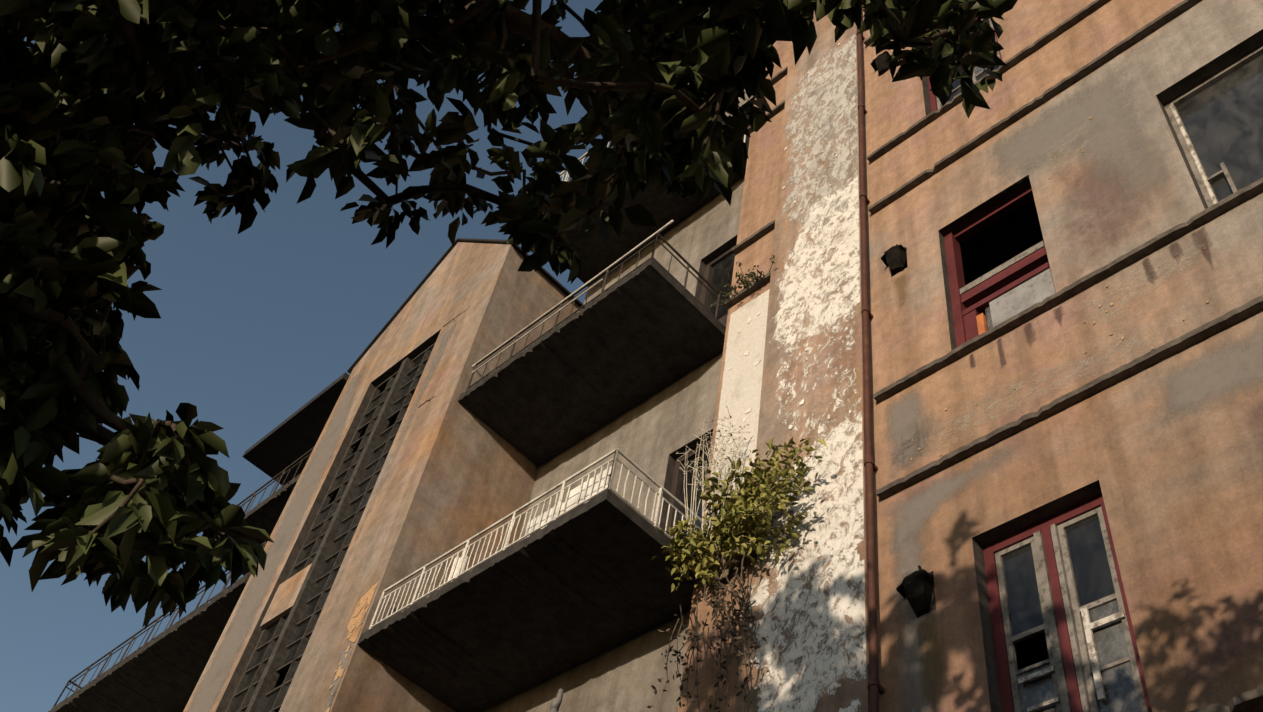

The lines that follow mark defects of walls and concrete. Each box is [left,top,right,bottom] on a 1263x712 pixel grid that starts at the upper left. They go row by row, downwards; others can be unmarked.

flaking render [324,581,379,712]
peeling [705,35,866,712]